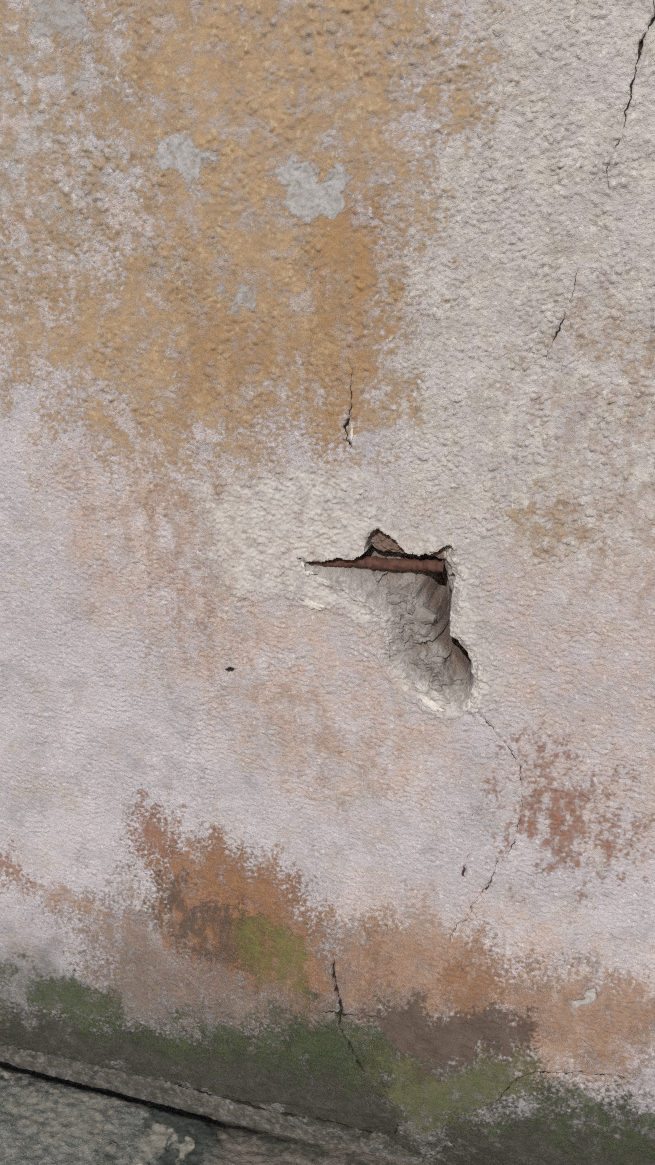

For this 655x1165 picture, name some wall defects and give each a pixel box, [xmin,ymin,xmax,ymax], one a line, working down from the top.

crack [606,0,655,189]
crack [546,271,578,358]
peeling [193,463,507,727]
crack [450,714,523,940]
damp [51,876,585,1081]
crack [321,962,387,1071]